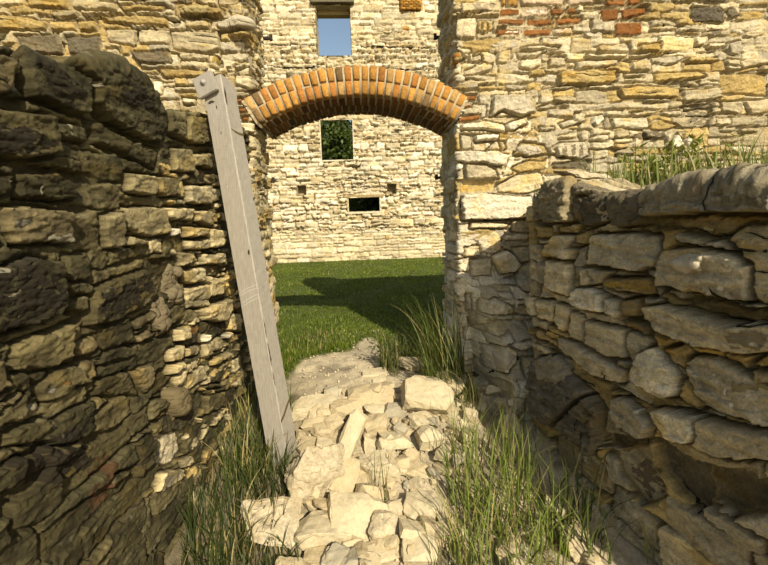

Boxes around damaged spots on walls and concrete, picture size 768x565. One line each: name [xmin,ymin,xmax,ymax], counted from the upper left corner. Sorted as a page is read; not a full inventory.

crack [358,28,432,49]
crack [266,63,322,71]